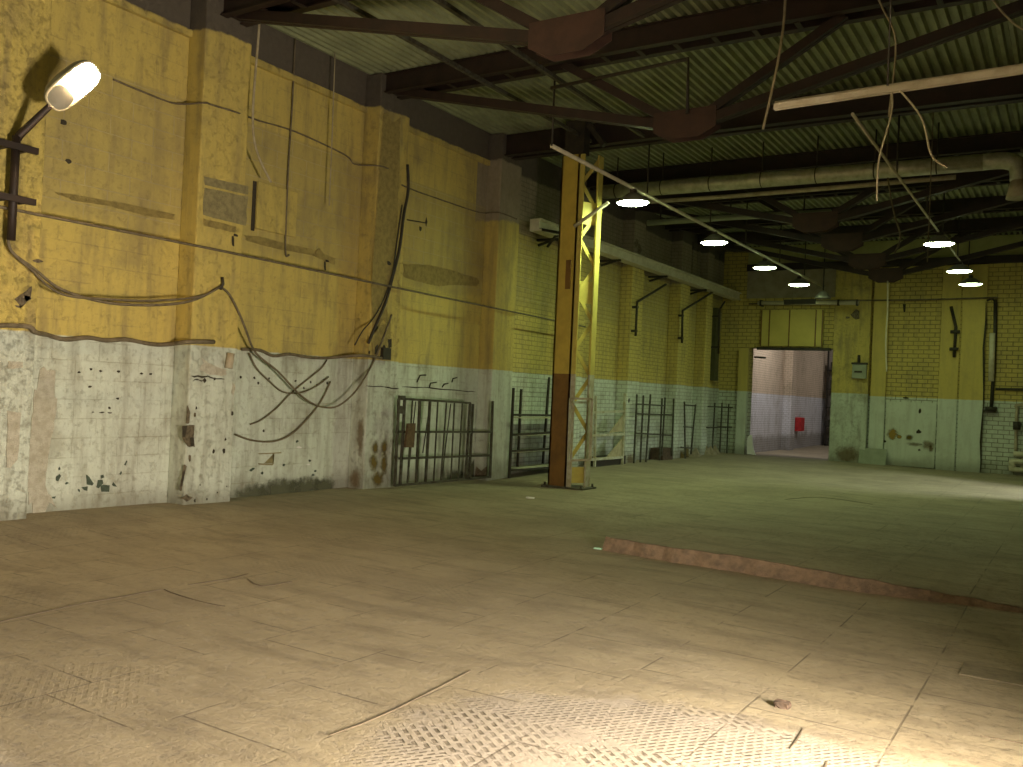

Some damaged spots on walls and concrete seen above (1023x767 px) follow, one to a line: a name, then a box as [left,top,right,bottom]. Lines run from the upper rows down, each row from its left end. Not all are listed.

flaking render [6,366,68,513]
corrosion [887,429,933,451]
peeling [78,461,127,492]
damp [236,478,332,497]
crack [0,573,292,622]